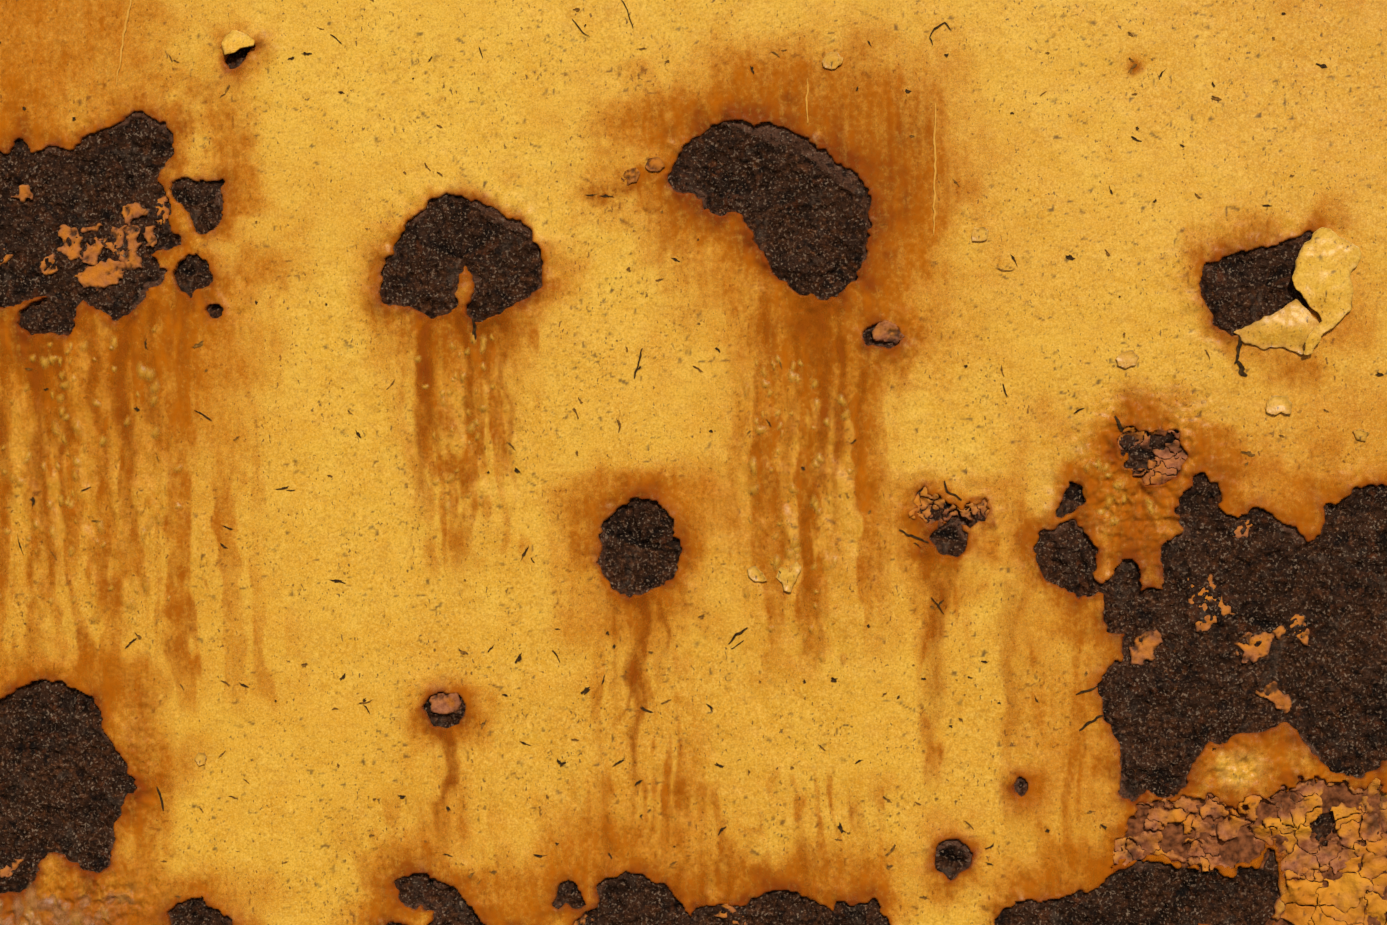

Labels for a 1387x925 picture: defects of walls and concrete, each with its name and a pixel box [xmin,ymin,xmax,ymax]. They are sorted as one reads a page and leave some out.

peeling [0,112,225,336]
rust [0,0,270,675]
peeling [380,194,543,322]
rust [365,190,561,548]
peeling [621,120,872,300]
rust [587,45,966,621]
rust [1190,213,1335,350]
peeling [1200,227,1361,355]
peeling [0,680,137,893]
rust [0,625,256,925]
rust [895,393,1387,925]
peeling [995,426,1387,925]